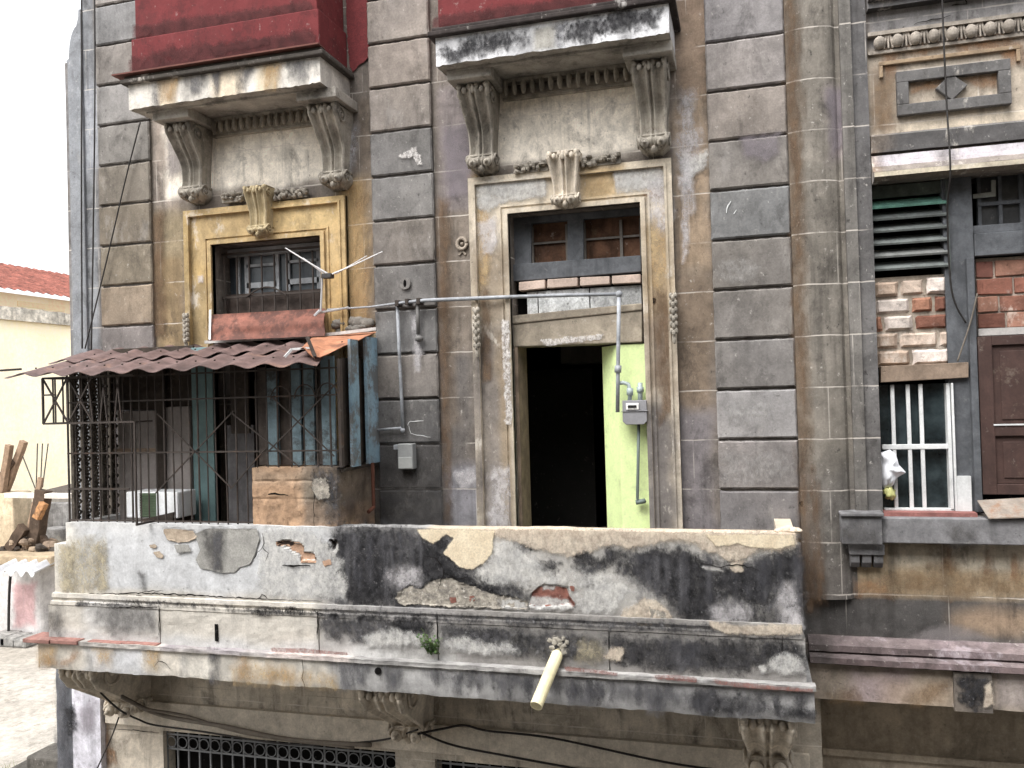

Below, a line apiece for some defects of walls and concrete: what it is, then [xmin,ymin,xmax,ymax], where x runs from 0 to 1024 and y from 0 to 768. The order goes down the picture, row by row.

mould [438,31,530,63]
mould [556,8,663,47]
peeling [149,528,348,600]
damp [58,426,824,719]
peeling [395,528,797,625]